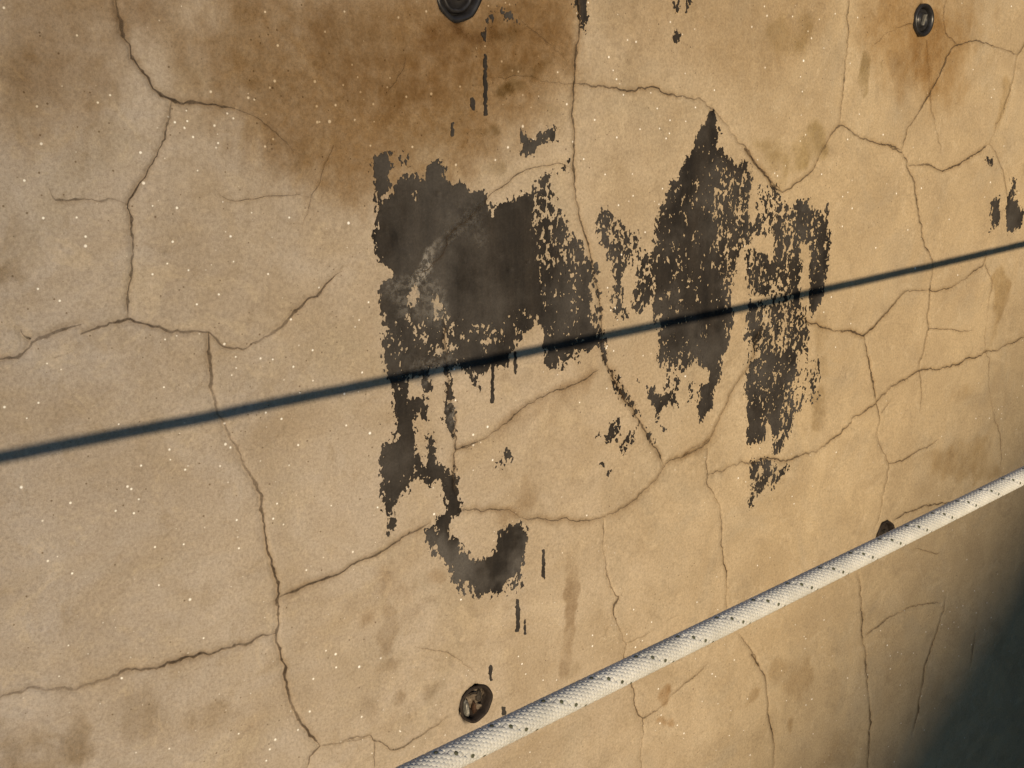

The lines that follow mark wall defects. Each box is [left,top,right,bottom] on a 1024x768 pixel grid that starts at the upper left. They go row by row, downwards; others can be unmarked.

crack [118,15,227,108]
crack [571,0,581,189]
crack [607,86,677,97]
crack [127,132,166,236]
crack [744,148,812,191]
crack [868,138,986,342]
peeling [988,177,1024,235]
crack [510,367,674,461]
peeling [368,109,832,599]
crack [807,298,899,440]
crack [251,492,419,697]
crack [133,648,223,670]